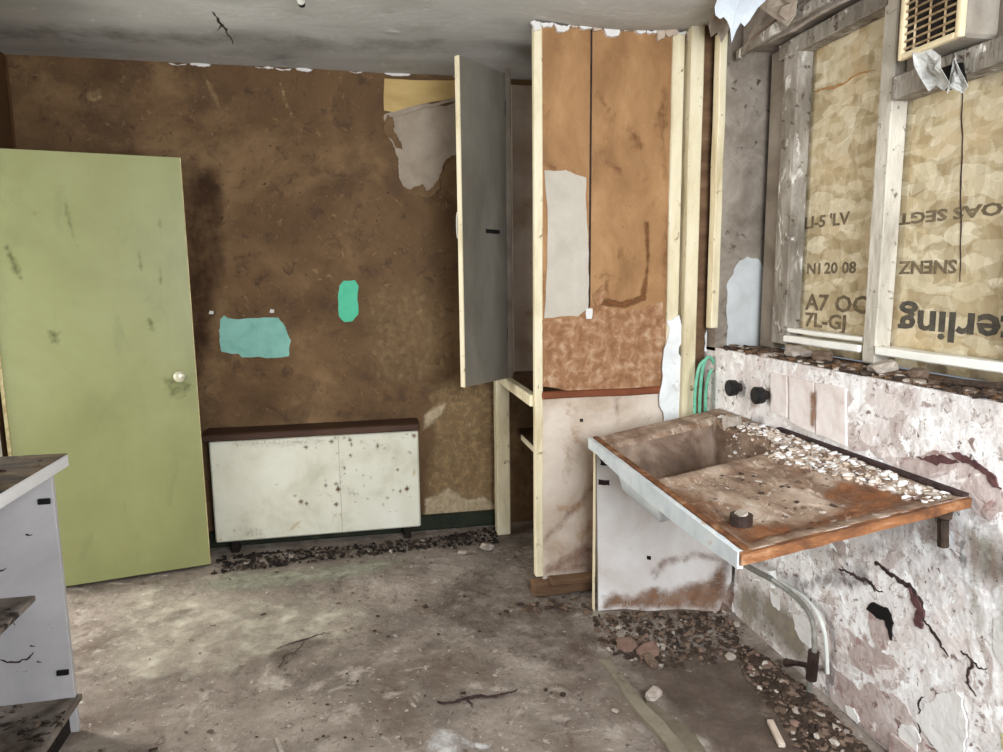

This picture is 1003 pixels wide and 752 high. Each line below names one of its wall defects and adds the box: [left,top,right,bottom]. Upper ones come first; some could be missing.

flaking render [384,73,457,198]
flaking render [726,257,763,346]
peeling [849,439,1003,520]
spalling [908,587,925,629]
flaking render [818,602,968,752]